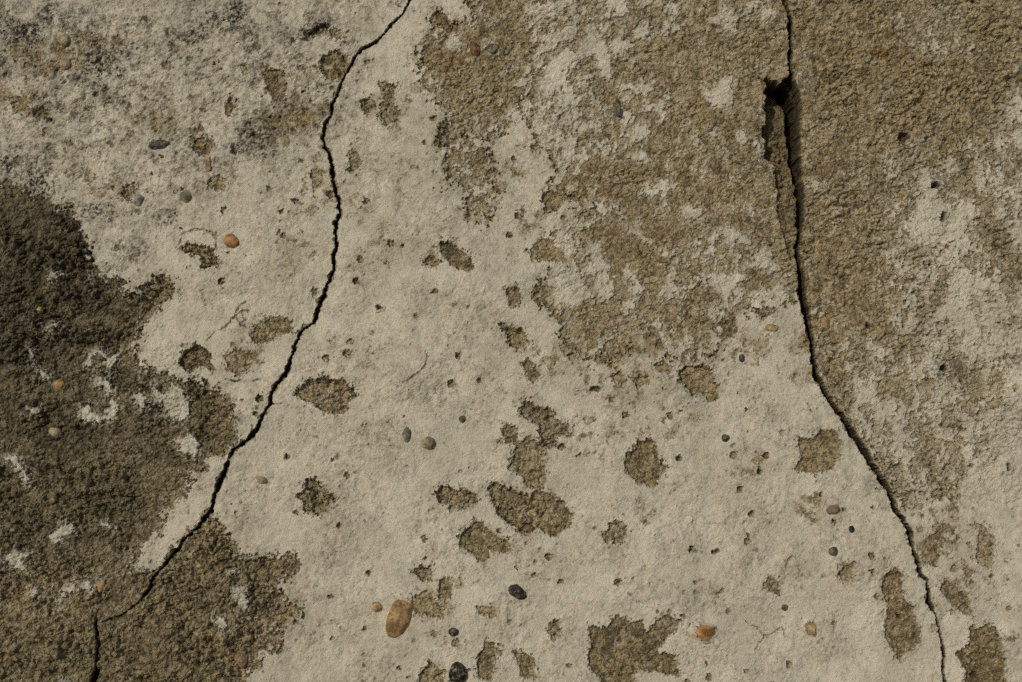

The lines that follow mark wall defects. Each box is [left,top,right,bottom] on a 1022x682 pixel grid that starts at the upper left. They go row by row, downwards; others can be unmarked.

peeling [420,0,1022,510]
peeling [0,184,301,682]
crack [89,0,412,682]
spalling [294,374,359,416]
crack [404,349,430,383]
peeling [434,400,574,563]
spalling [603,519,628,544]
crack [744,0,947,682]
peeling [975,524,997,570]
peeling [587,614,683,682]
peeling [881,566,924,664]
peeling [939,579,1020,682]